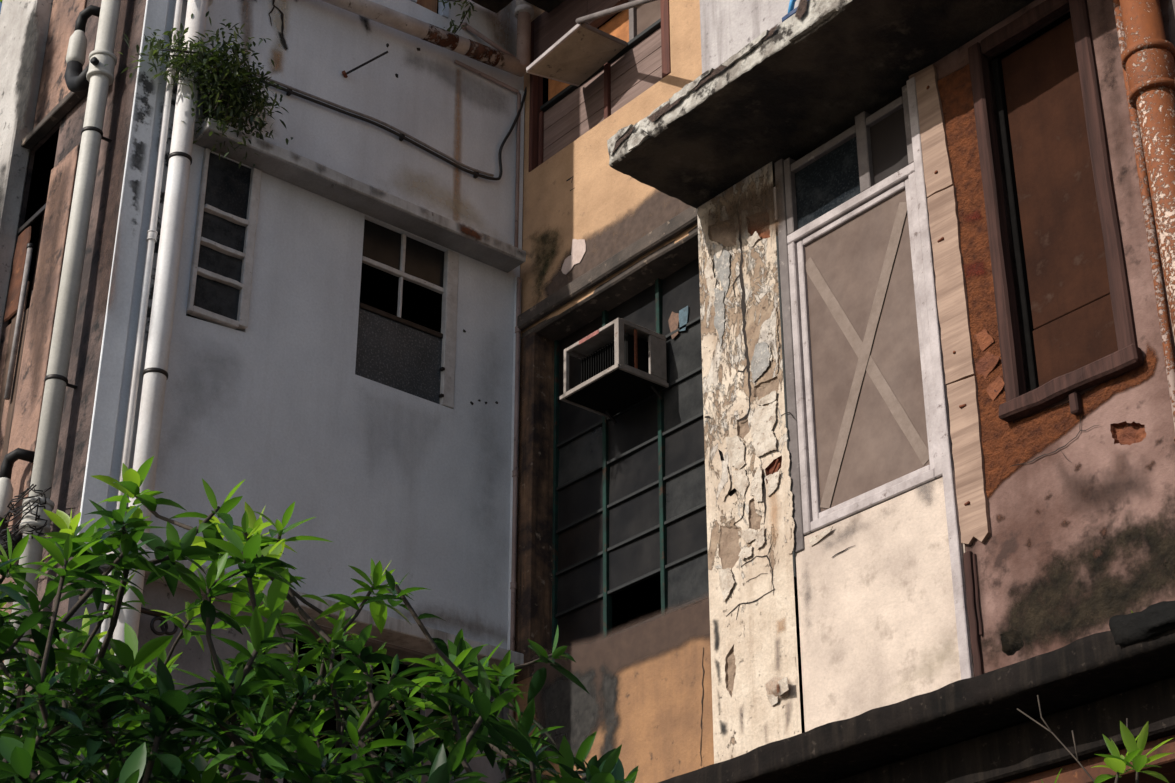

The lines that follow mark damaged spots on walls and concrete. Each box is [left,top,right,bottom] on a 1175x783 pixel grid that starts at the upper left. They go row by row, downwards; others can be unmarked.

rust [422,23,501,67]
peeling [607,24,778,155]
spalling [795,0,808,20]
damp [97,0,178,309]
rust [454,70,482,240]
peeling [561,239,586,275]
damp [545,190,691,297]
peeling [704,224,770,348]
crack [732,232,751,422]
spalling [937,64,1161,499]
damp [1074,456,1136,503]